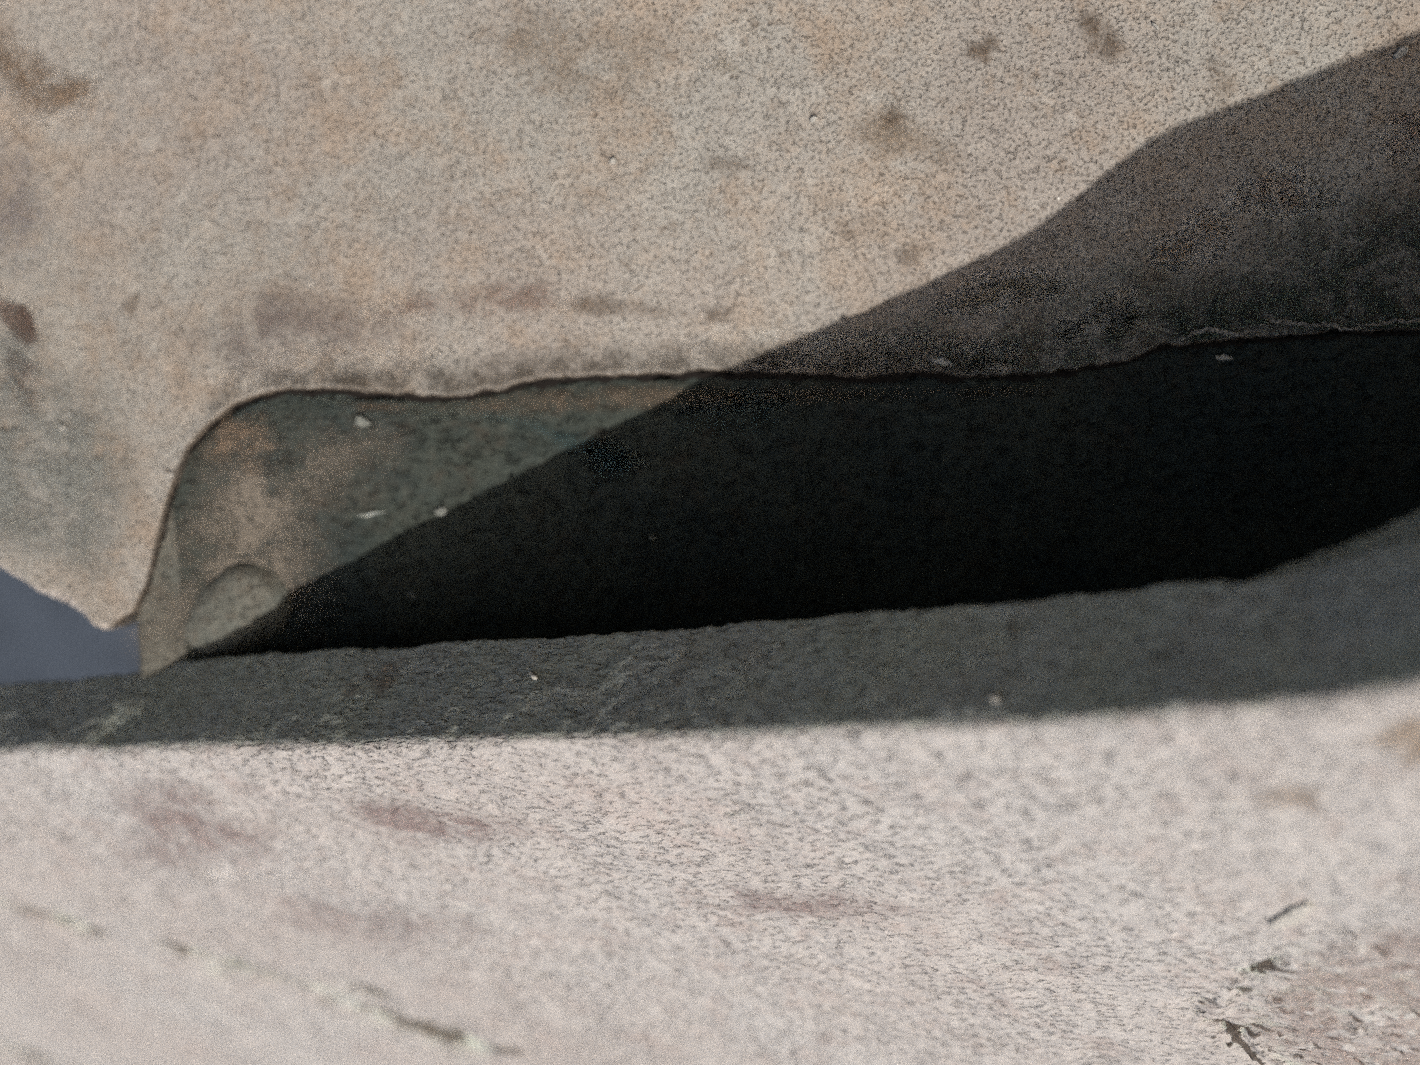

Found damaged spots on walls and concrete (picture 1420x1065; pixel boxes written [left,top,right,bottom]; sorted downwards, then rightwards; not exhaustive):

peeling [355,416,372,427]
crack [1198,958,1288,1065]